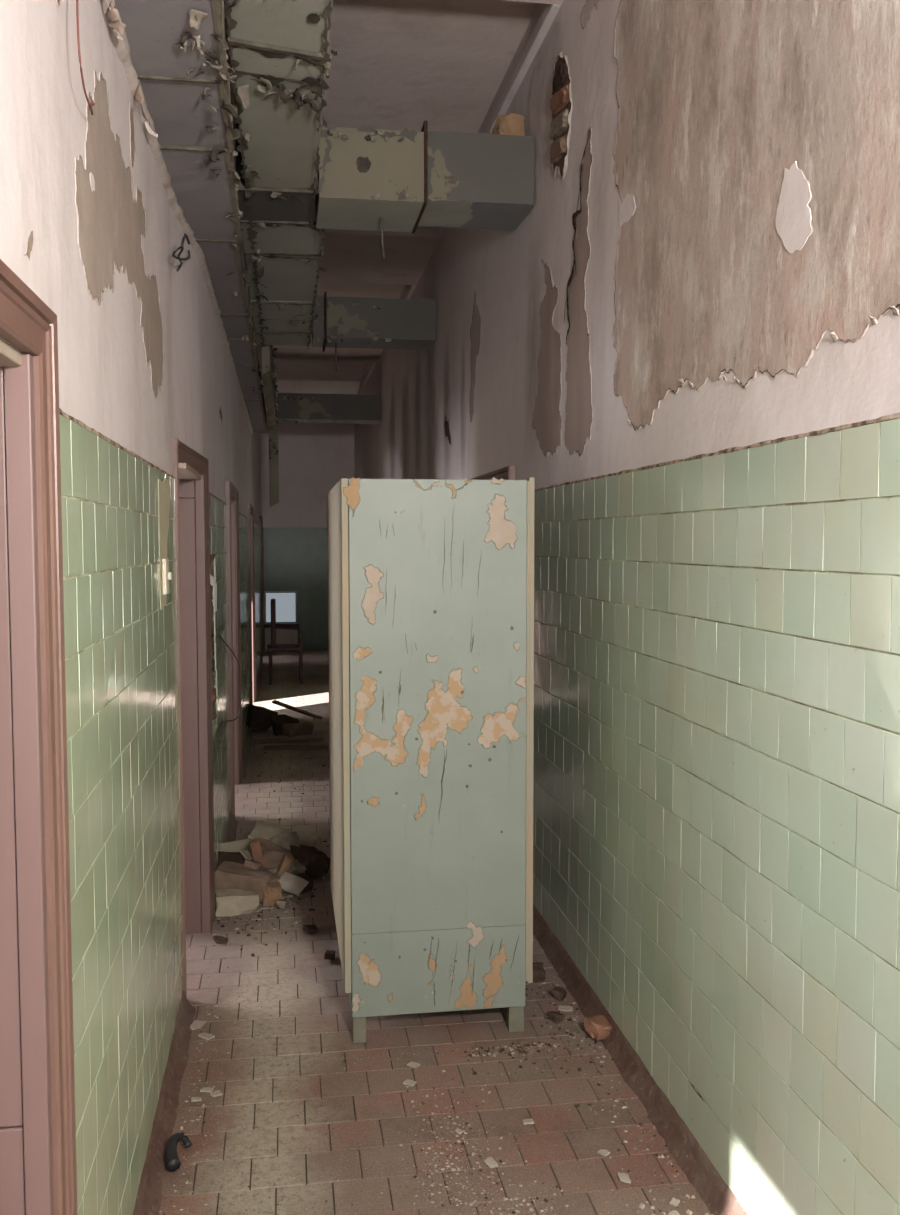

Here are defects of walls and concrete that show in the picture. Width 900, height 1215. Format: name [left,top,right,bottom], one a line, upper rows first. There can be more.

flaking render [74,69,164,400]
peeling [173,9,418,193]
flaking render [532,51,593,458]
flaking render [613,0,900,431]
spalling [210,553,219,721]